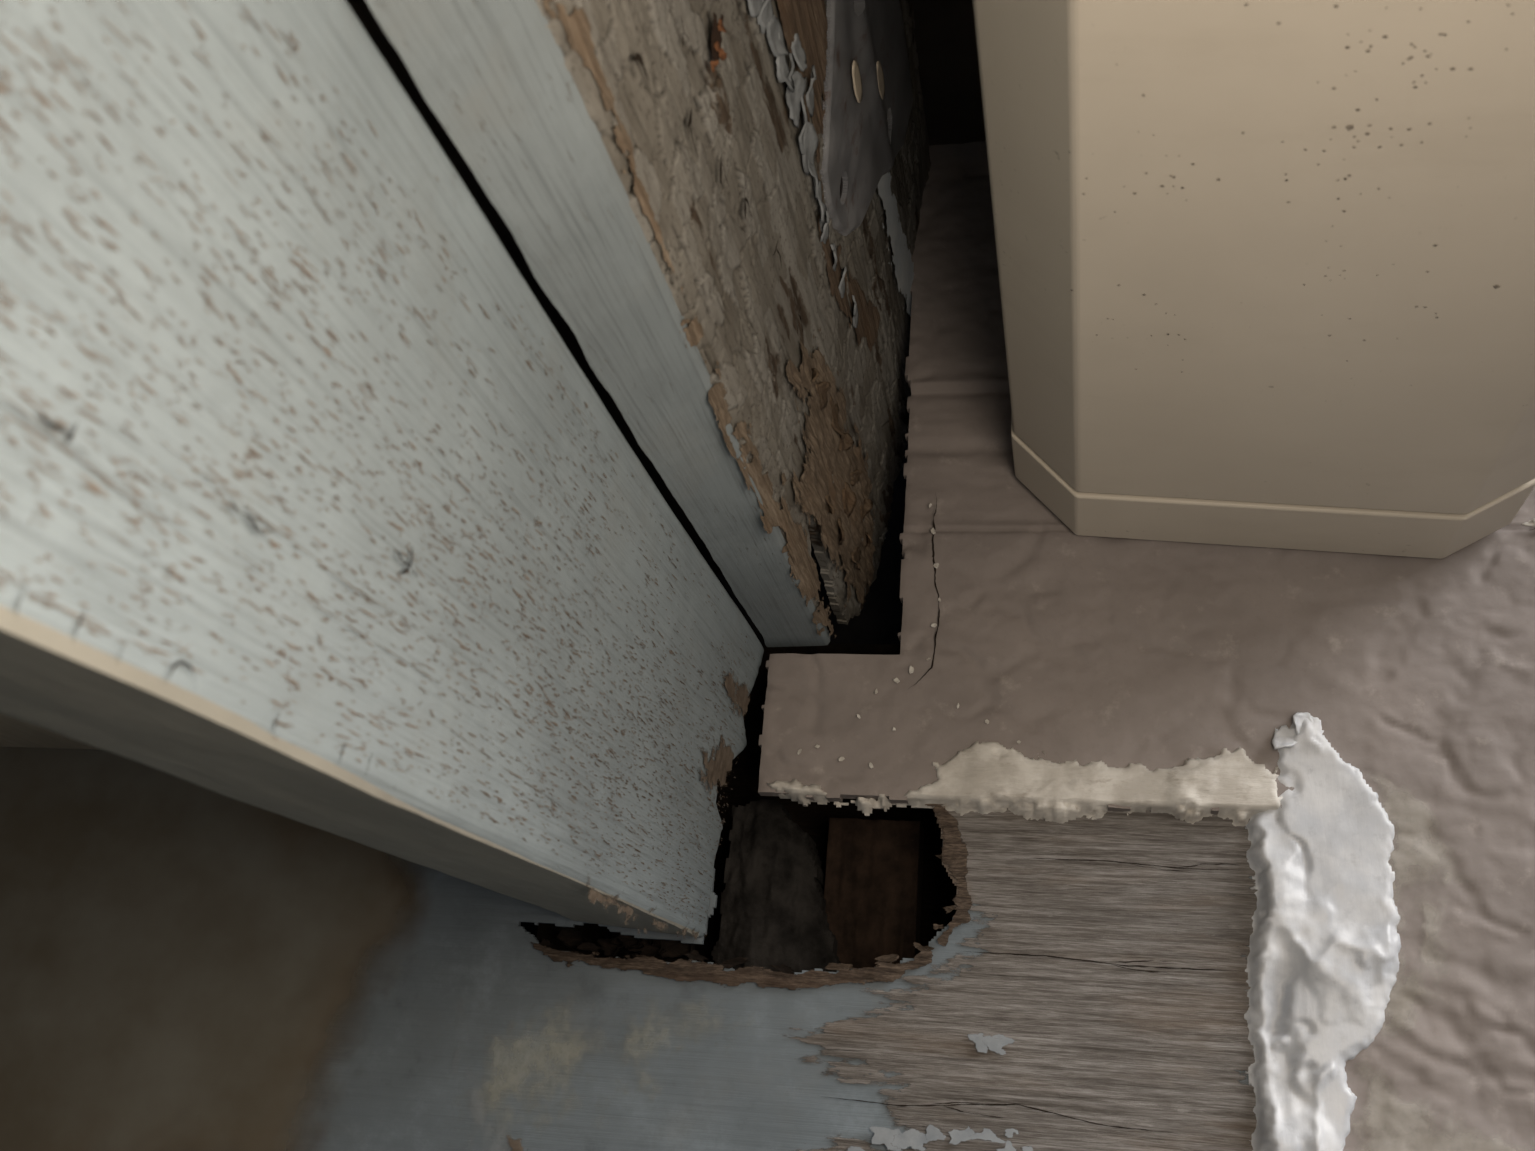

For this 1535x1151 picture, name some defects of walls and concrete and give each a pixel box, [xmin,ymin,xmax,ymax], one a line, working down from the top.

peeling [748,0,880,351]
water stain [0,747,415,1151]
peeling [586,882,707,940]
peeling [700,735,734,794]
peeling [724,671,750,716]
peeling [786,806,1258,1151]